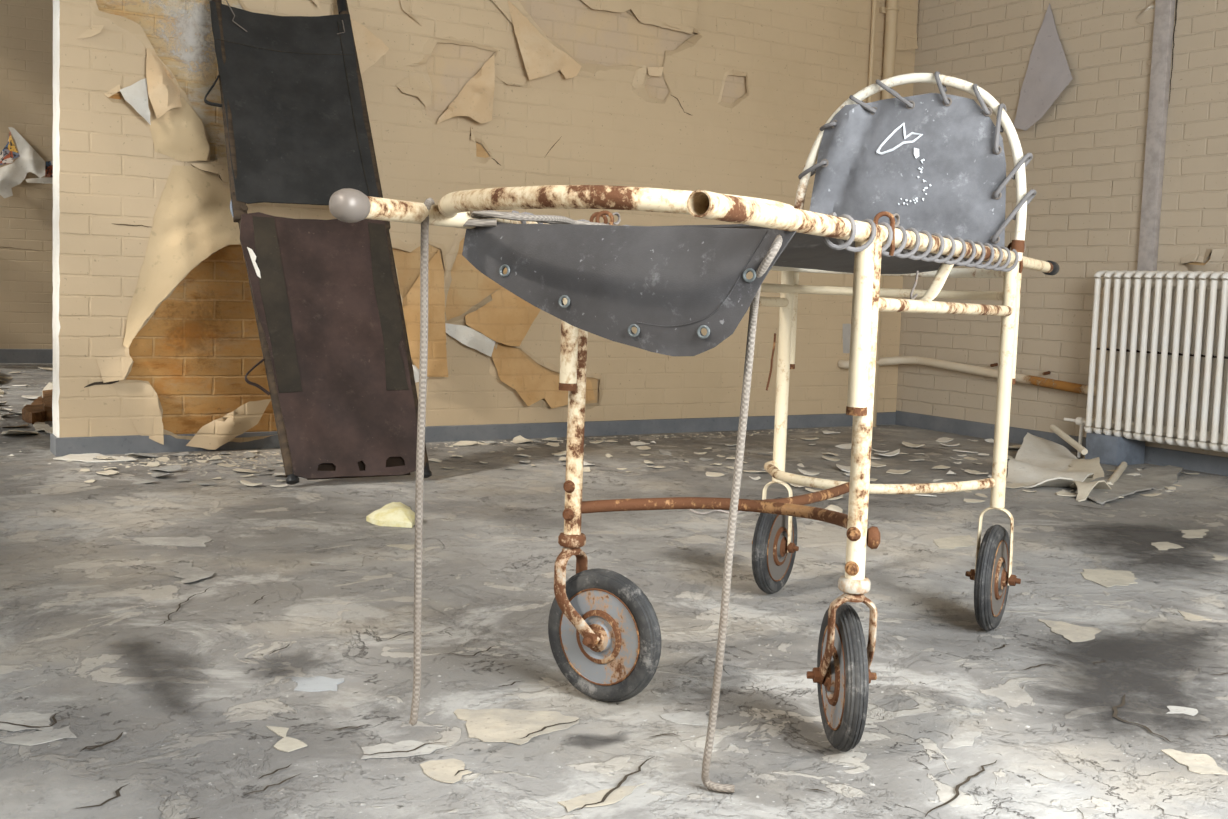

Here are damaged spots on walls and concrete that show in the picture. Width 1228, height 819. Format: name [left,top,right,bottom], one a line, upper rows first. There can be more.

leakage [162,4,212,72]
peeling [351,18,389,74]
peeling [396,0,703,164]
peeling [1014,3,1073,131]
peeling [78,0,288,487]
peeling [391,228,568,409]
peeling [585,371,603,410]
crack [903,760,997,817]